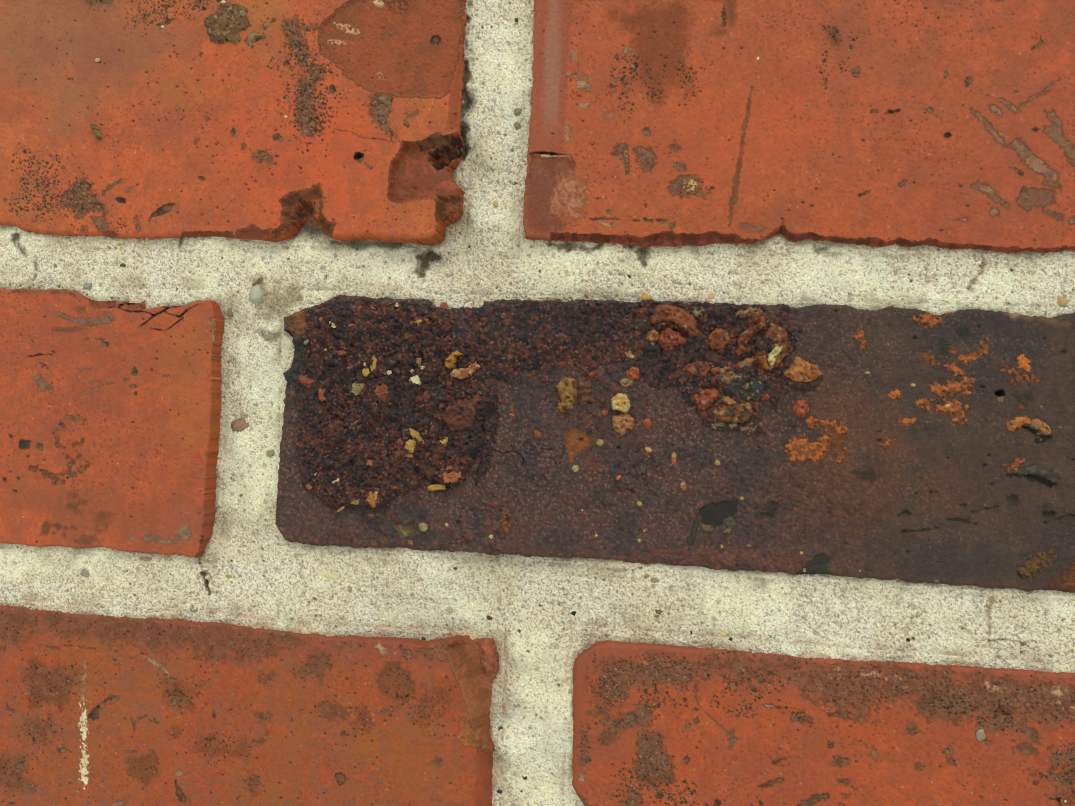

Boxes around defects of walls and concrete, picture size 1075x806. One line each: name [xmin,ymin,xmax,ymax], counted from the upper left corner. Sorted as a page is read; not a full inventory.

spalling [230,0,465,222]
spalling [527,156,1075,253]
crack [118,304,198,330]
spalling [283,311,392,408]
peeling [409,358,431,399]
peeling [445,350,481,386]
peeling [395,417,424,459]
peeling [428,466,461,491]
peeling [337,491,378,518]
spalling [318,635,499,752]